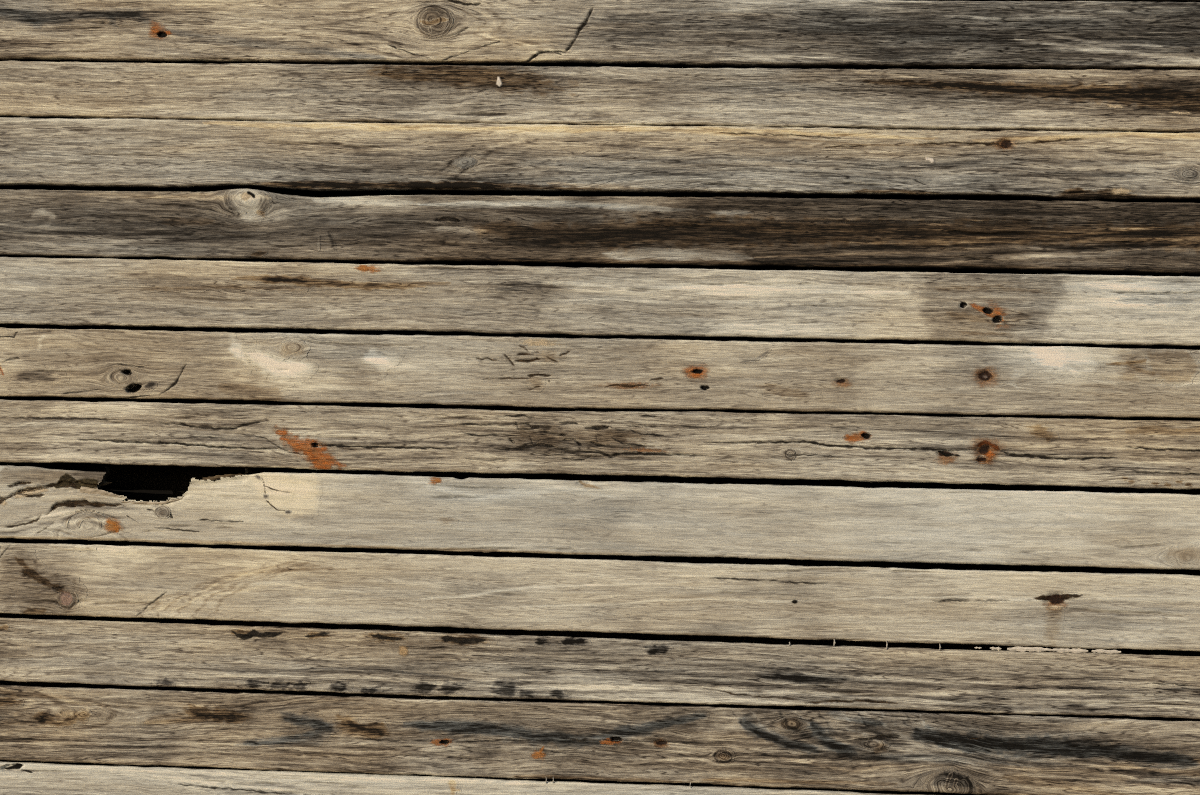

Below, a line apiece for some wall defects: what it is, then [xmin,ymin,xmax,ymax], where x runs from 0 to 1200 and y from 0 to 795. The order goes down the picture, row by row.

crack [389,0,500,60]
crack [528,8,593,62]
corrosion [960,302,1005,326]
corrosion [685,367,709,390]
spalling [80,466,181,505]
spalling [198,468,252,482]
corrosion [275,429,345,470]
crack [0,339,954,557]
corrosion [845,431,871,442]
corrosion [977,440,999,464]
crack [1004,447,1200,475]
crack [715,576,816,584]